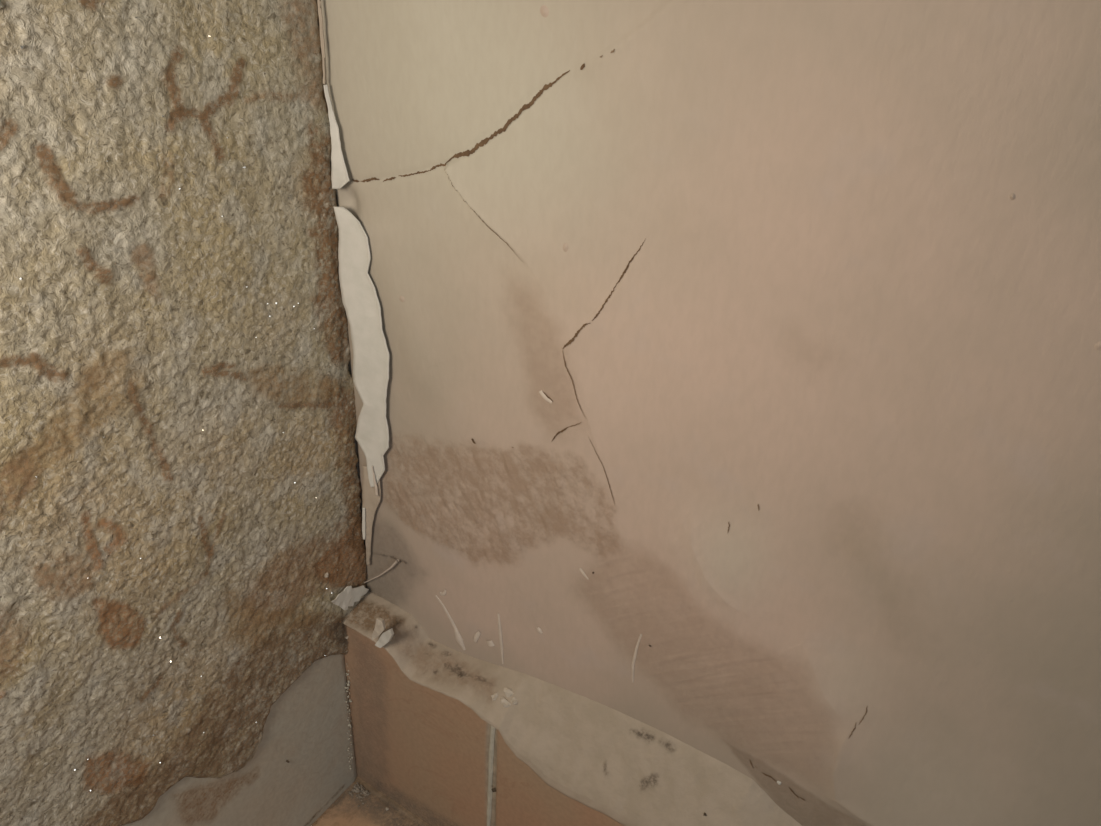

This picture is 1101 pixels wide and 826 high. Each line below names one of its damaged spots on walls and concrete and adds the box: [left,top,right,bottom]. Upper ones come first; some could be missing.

peeling [317,0,350,189]
crack [352,49,615,187]
peeling [334,207,390,565]
crack [543,238,646,500]